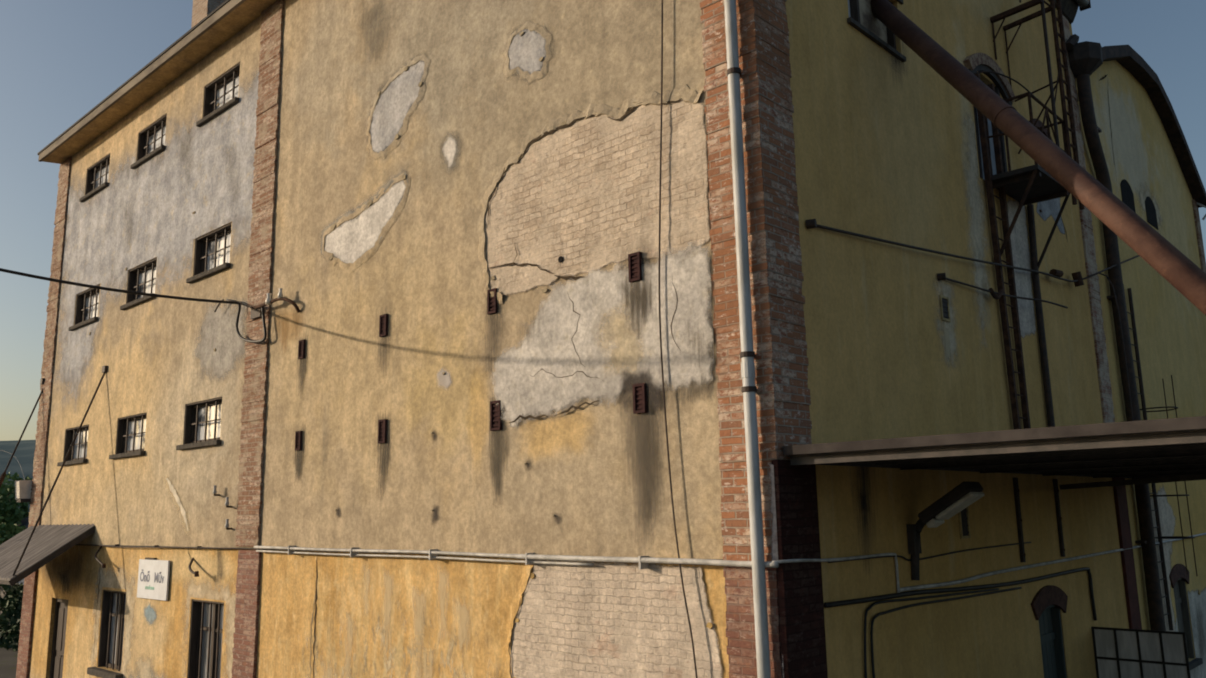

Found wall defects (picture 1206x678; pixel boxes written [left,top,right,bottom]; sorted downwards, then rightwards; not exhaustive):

peeling [503,20,553,85]
peeling [321,171,410,273]
peeling [365,53,430,160]
peeling [441,134,459,170]
flaking render [477,84,710,305]
crack [509,292,602,423]
crack [670,285,681,351]
leakage [489,422,506,489]
crack [309,560,317,678]
flaking render [502,559,722,678]
peeling [1150,487,1206,678]